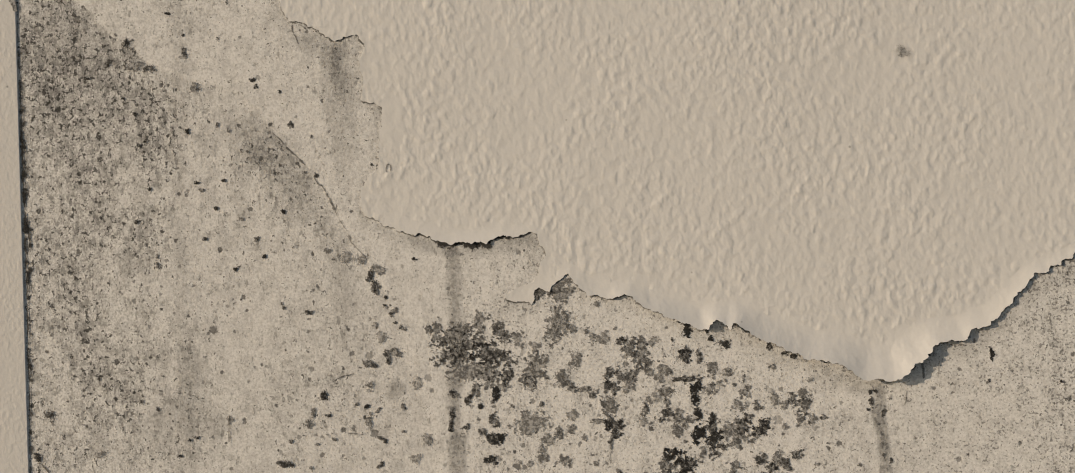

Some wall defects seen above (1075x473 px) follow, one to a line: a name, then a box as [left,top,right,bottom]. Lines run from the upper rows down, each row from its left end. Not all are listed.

water stain [114,34,155,72]
water stain [424,278,829,473]